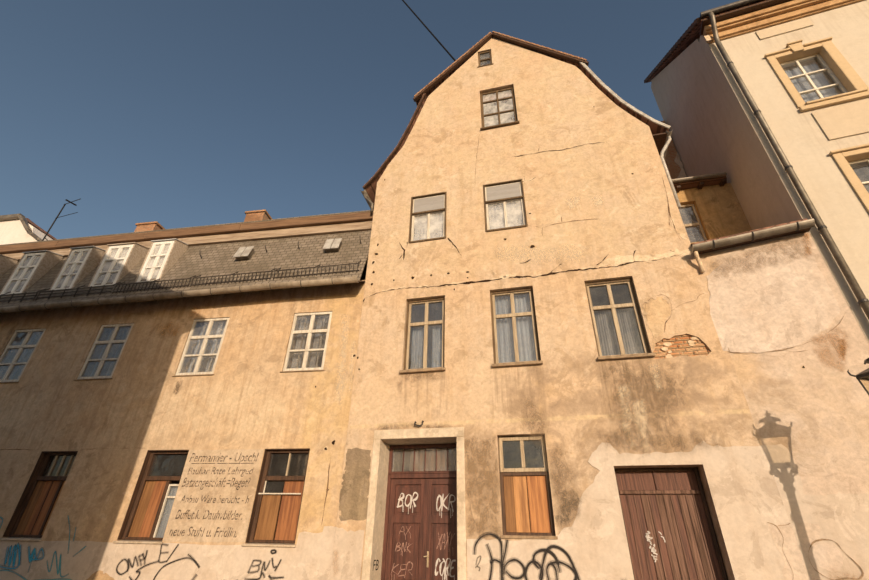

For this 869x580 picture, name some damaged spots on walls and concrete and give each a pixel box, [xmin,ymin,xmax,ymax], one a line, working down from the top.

crack [512,142,605,157]
crack [363,181,682,302]
flaking render [642,296,711,359]
flaking render [328,447,371,521]